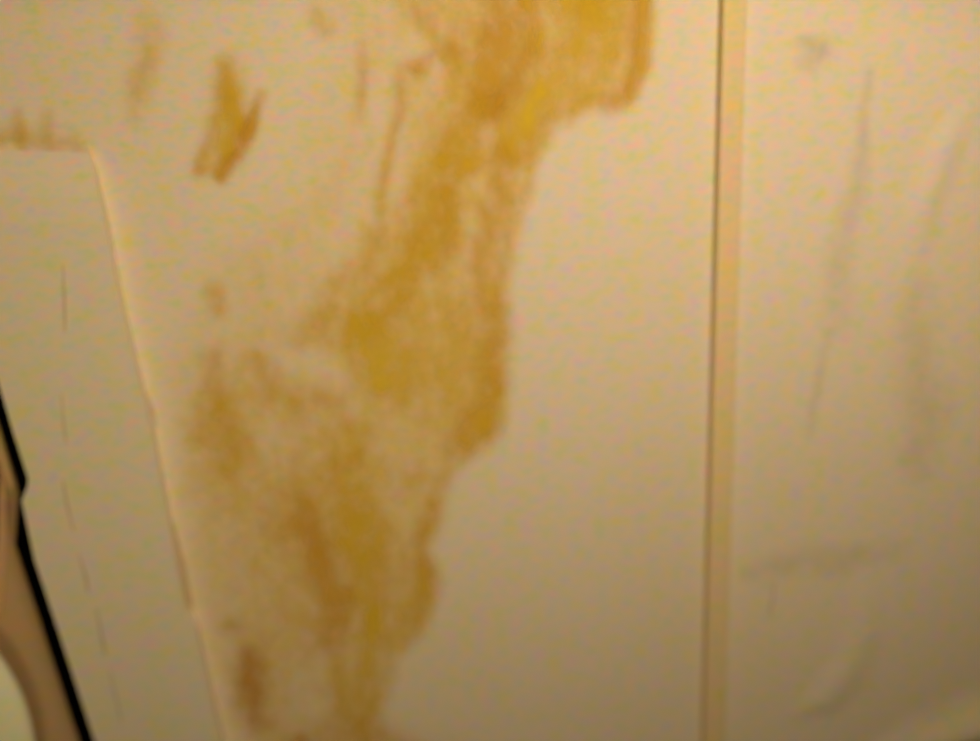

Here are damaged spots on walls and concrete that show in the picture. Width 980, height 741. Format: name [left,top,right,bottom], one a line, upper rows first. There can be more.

leakage [627,0,648,99]
leakage [502,76,553,161]